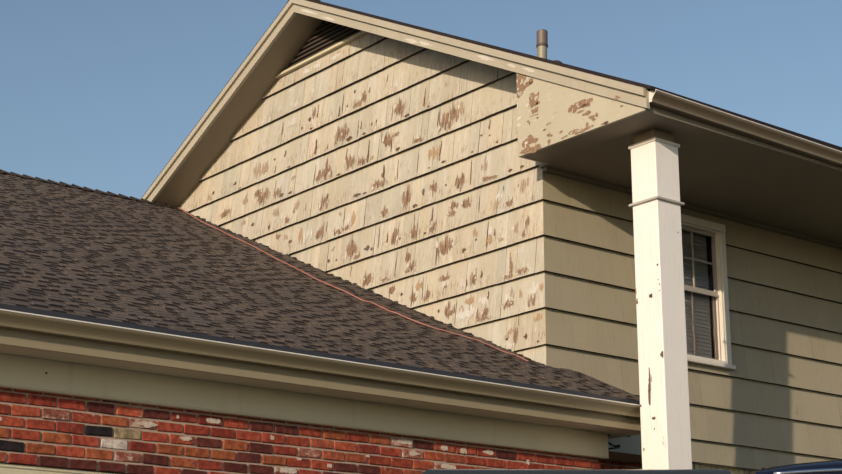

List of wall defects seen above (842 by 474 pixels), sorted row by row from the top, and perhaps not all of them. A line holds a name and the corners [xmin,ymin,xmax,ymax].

peeling [334,123,352,144]
peeling [437,100,465,134]
peeling [516,73,608,154]
peeling [313,155,366,184]
peeling [233,182,300,224]
peeling [401,186,418,209]
peeling [428,172,472,217]
peeling [315,211,360,262]
peeling [363,209,437,304]
peeling [433,235,466,265]
peeling [501,261,543,309]
peeling [438,296,491,322]